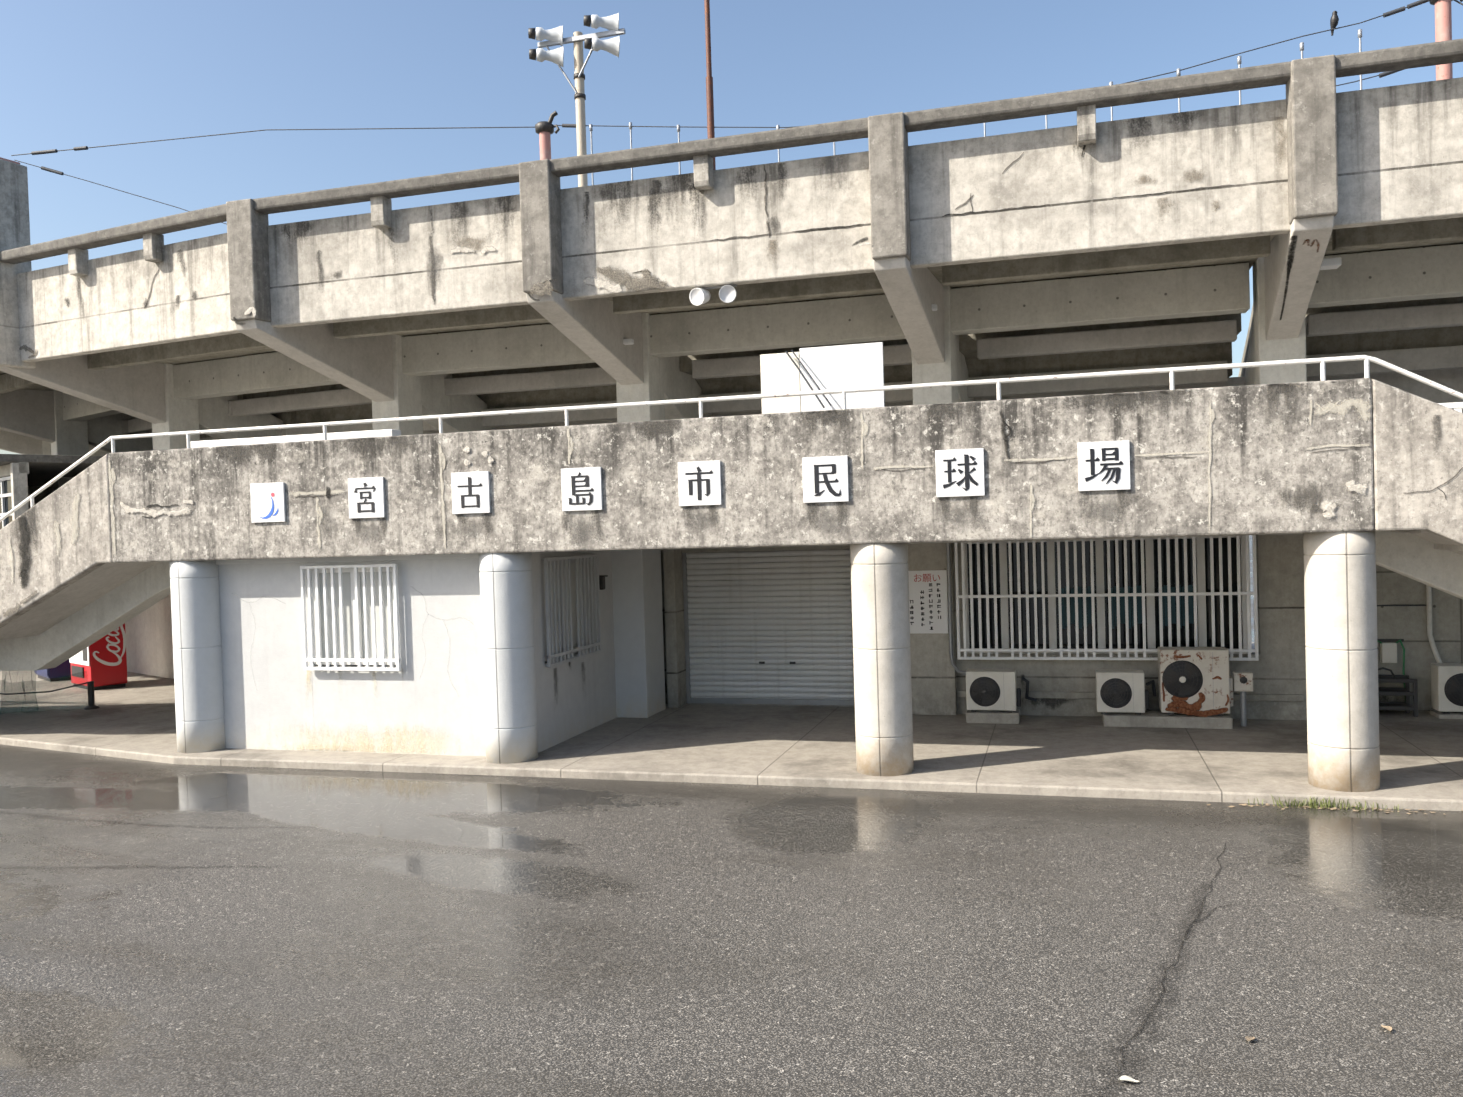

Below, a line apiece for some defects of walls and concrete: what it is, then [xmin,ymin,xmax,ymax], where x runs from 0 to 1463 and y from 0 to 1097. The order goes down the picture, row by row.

leakage [1128,116,1151,141]
leakage [1170,112,1195,128]
leakage [778,163,787,194]
leakage [284,221,311,238]
leakage [452,202,483,249]
leakage [495,196,513,223]
leakage [584,181,631,220]
leakage [648,173,702,221]
leakage [768,218,778,253]
leakage [317,251,341,286]
spalling [584,266,673,293]
leakage [14,506,35,588]